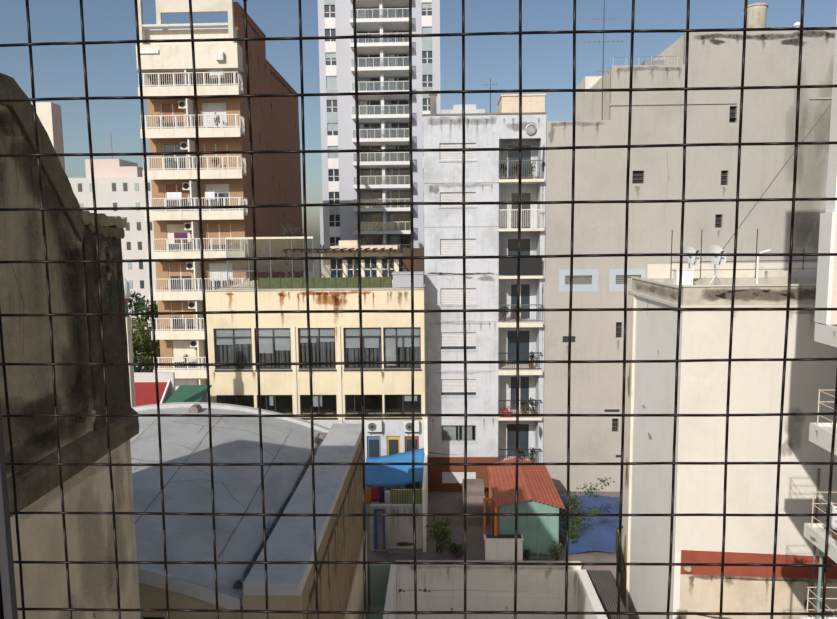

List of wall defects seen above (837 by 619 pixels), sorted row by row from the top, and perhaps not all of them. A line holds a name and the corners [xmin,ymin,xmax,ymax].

leakage [701,31,835,45]
corrosion [279,291,374,310]
leakage [5,370,88,474]